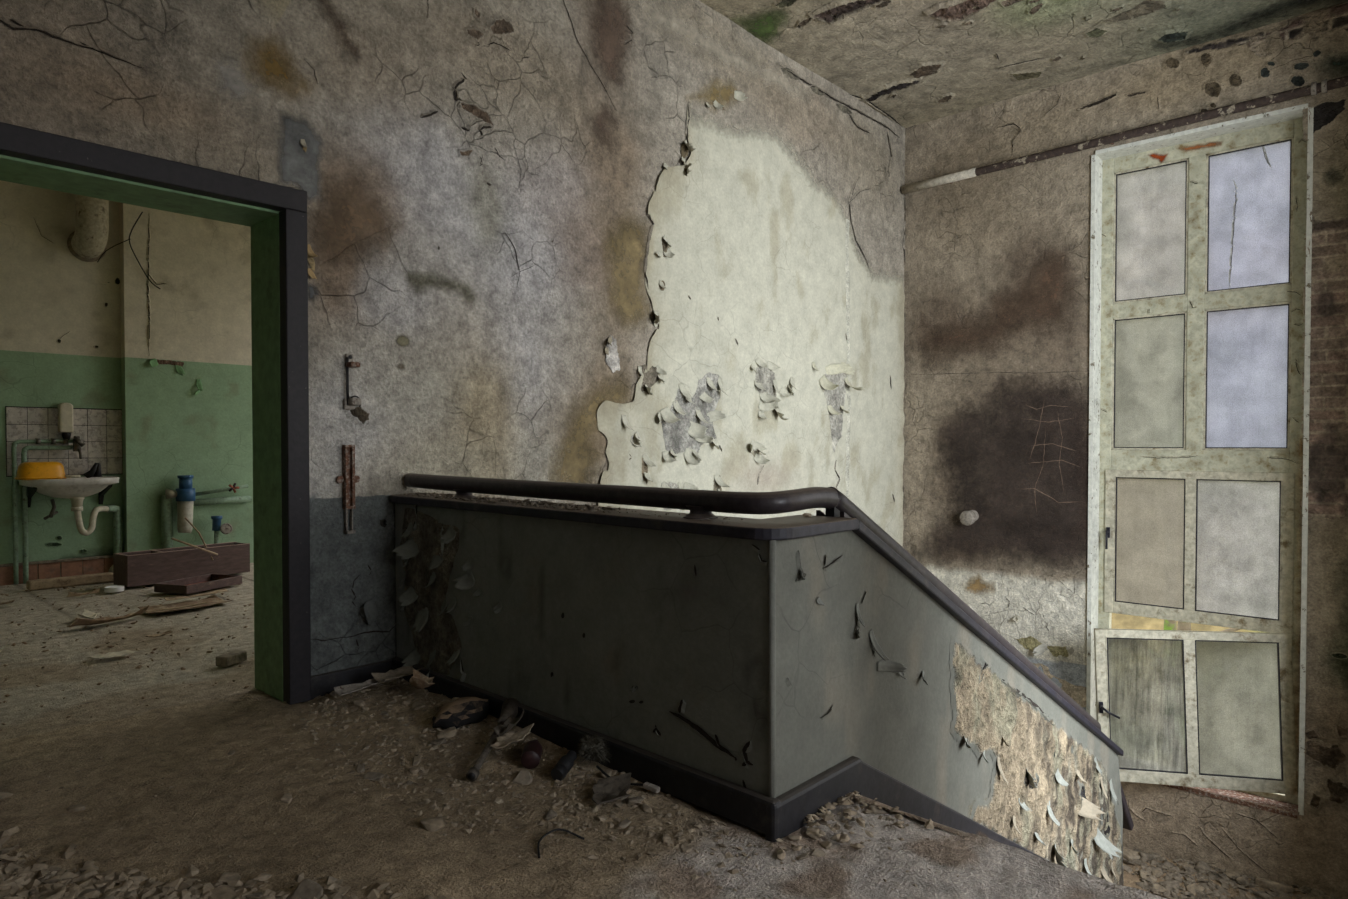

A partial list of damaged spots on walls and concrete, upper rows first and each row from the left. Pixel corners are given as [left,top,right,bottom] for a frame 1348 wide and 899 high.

crack [0,16,144,68]
spalling [771,0,893,29]
spalling [921,0,1048,28]
damp [1157,0,1348,47]
spalling [861,60,946,102]
spalling [1302,93,1348,141]
peeling [622,365,731,491]
peeling [751,357,796,420]
peeling [812,362,865,452]
flaking render [1300,208,1348,523]
damp [914,384,1089,566]
peeling [948,634,1124,886]